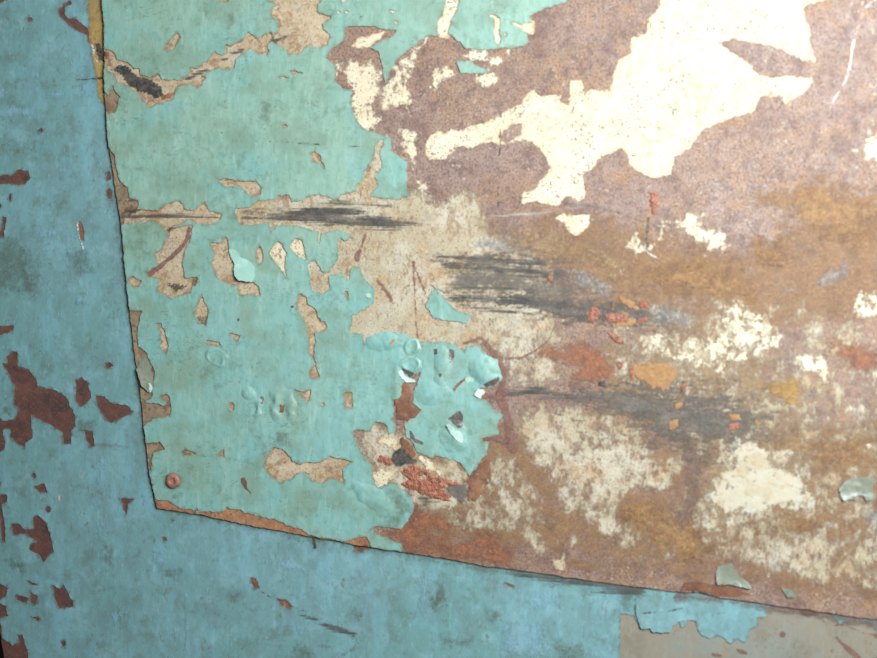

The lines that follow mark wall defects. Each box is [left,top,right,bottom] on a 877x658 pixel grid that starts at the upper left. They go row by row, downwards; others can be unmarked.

peeling [87,0,349,108]
peeling [130,310,171,427]
peeling [120,201,222,326]
leakage [242,200,395,226]
leakage [439,239,563,278]
rust [152,0,877,629]
peeling [211,0,824,387]
leakage [446,286,691,326]
peeling [264,447,351,483]
peeling [359,424,577,571]
peeling [514,290,877,593]
peeling [619,587,877,658]